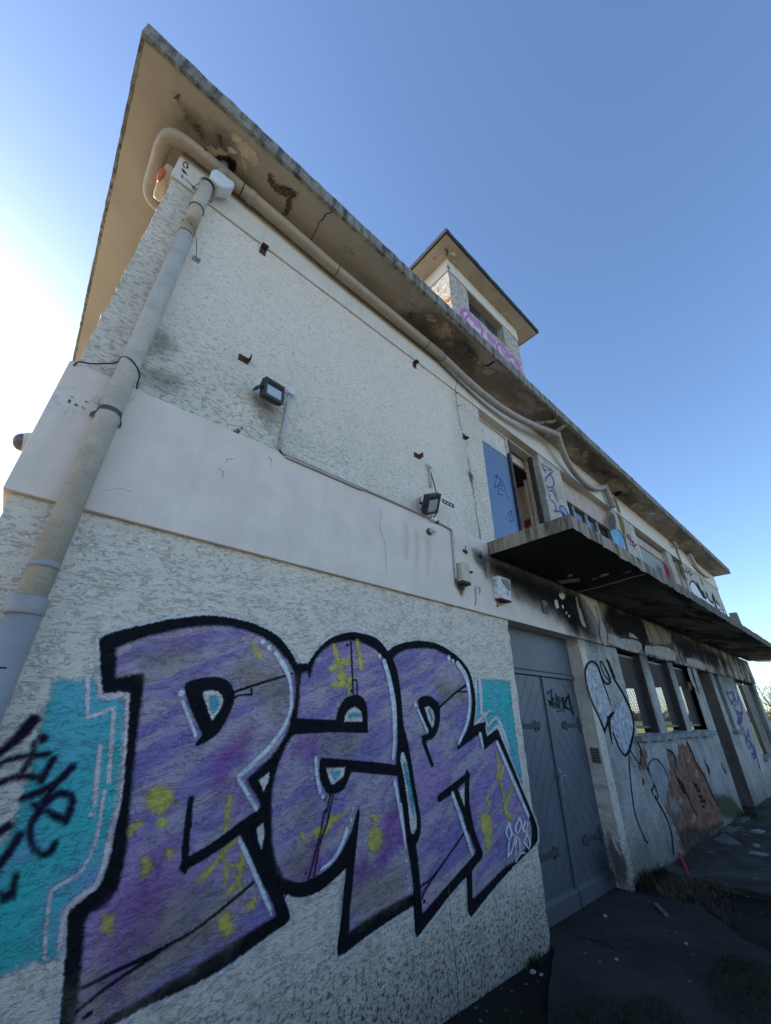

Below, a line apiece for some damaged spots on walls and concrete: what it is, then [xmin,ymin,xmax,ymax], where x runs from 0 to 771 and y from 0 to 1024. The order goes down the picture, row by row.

peeling [184,115,299,216]
leakage [475,552,646,652]